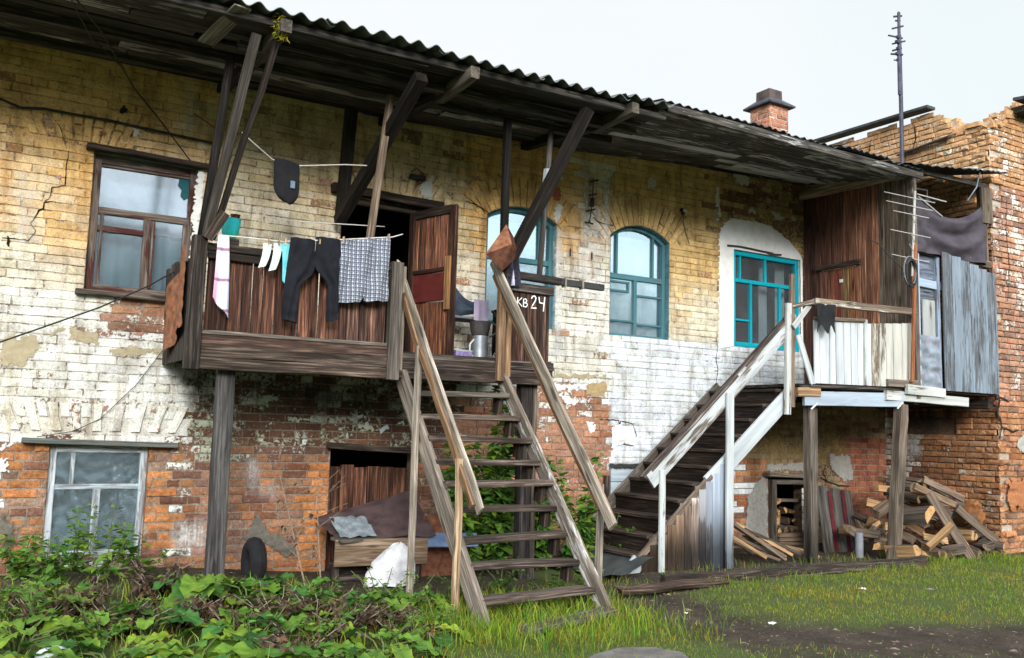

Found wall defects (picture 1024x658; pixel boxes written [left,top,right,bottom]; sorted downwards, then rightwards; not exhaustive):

crack [2,114,88,247]
peeling [0,334,42,367]
peeling [50,326,163,358]
spalling [553,373,607,405]
peeling [829,453,854,482]
spalling [1006,476,1024,515]